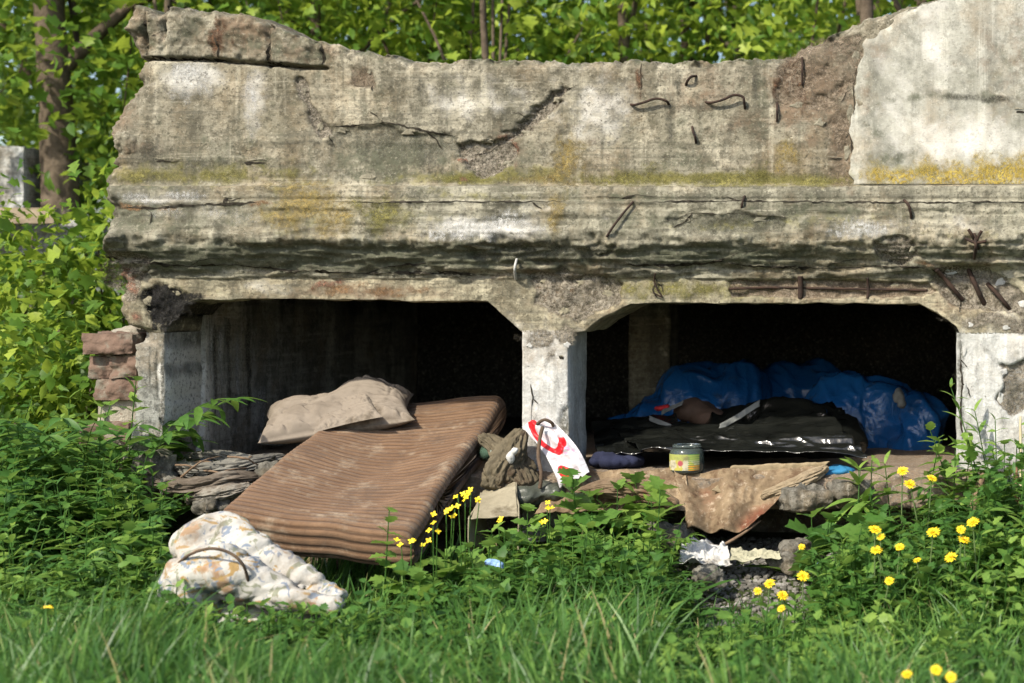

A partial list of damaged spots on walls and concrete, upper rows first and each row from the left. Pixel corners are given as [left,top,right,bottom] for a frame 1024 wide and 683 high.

spalling [295,77,567,181]
crack [329,85,573,155]
flaking render [775,35,864,183]
leakage [271,183,352,228]
spalling [102,251,186,326]
spalling [996,360,1024,416]